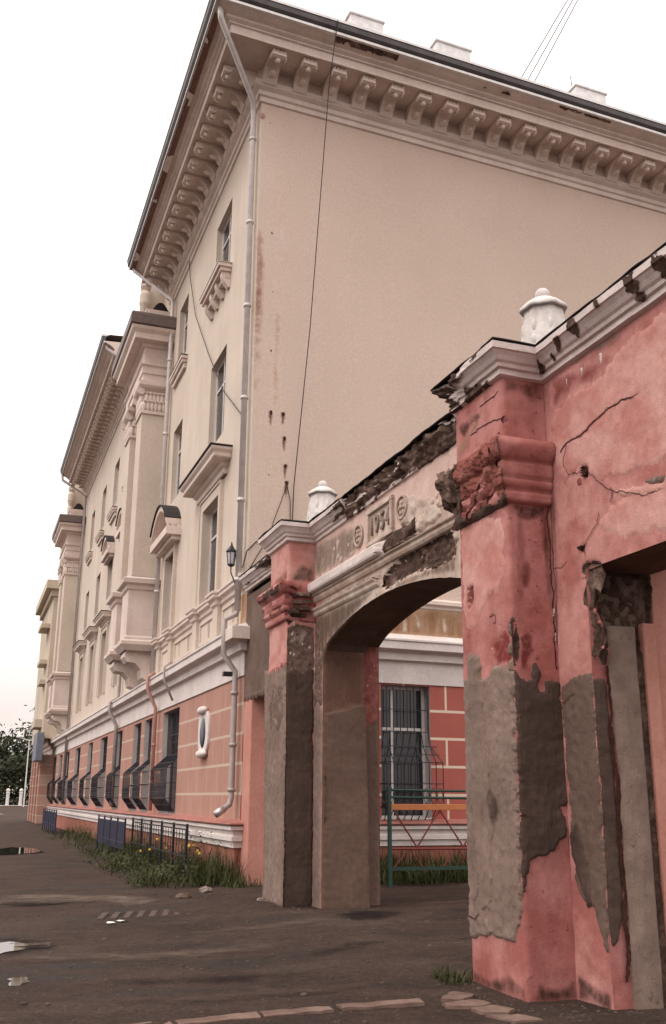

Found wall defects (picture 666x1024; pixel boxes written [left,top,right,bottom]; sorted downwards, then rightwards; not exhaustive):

flaking render [343,373,491,514]
flaking render [378,432,505,590]
crack [470,391,507,436]
peeling [537,317,580,374]
crack [546,391,663,670]
peeling [622,270,646,302]
peeling [650,251,666,280]
peeling [258,584,324,909]
flaking render [582,557,666,1007]